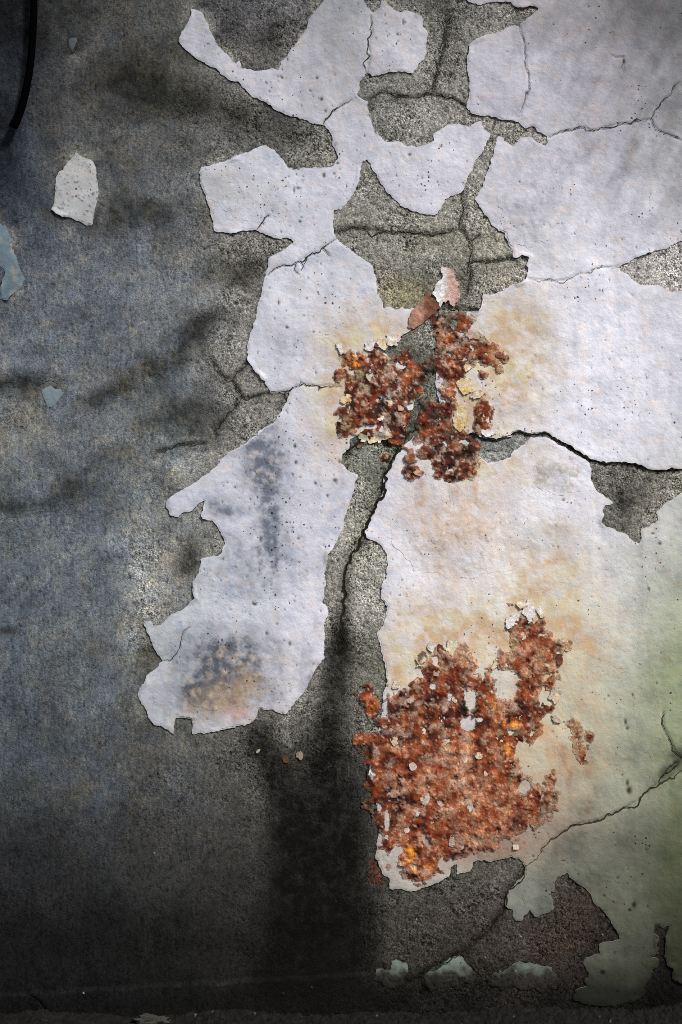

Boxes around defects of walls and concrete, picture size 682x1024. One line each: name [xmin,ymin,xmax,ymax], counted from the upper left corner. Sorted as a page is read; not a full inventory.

crack [324,18,458,122]
crack [269,192,511,289]
peeling [333,0,547,349]
peeling [618,241,682,292]
peeling [0,0,338,1018]
peeling [322,436,409,644]
crack [340,428,416,653]
rust [295,267,646,887]
spalling [465,432,682,543]
crack [467,431,682,472]
peeling [335,857,682,1015]
crack [407,712,682,982]